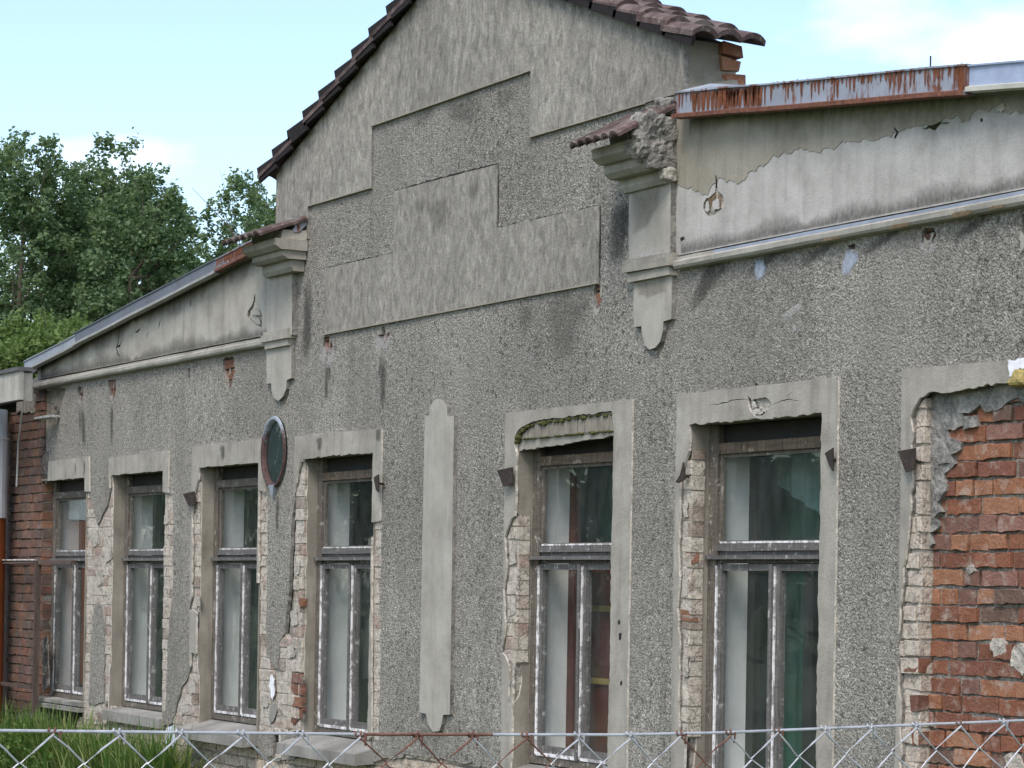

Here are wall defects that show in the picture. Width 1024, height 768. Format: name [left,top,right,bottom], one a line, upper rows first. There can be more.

corrosion [678,66,967,111]
flaking render [676,102,1024,256]
crack [709,383,798,411]
flaking render [76,462,486,768]
flaking render [504,516,530,700]
flaking render [680,451,705,738]
flaking render [899,398,935,768]